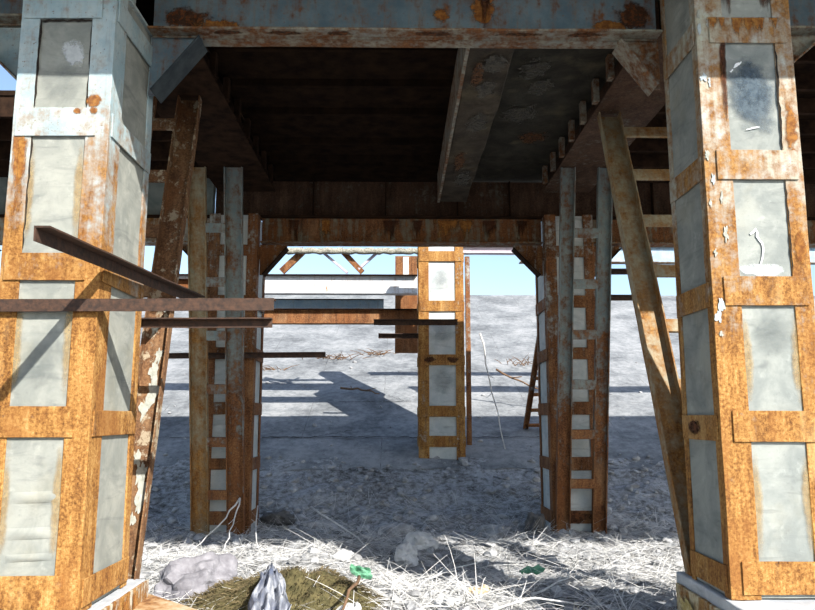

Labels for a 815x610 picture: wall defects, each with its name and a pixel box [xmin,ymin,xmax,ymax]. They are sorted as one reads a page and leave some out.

rust [166,6,241,35]
rust [416,9,450,36]
rust [470,0,495,25]
rust [568,1,648,37]
leakage [64,45,83,65]
rust [73,95,101,113]
leakage [729,63,773,124]
peeling [714,298,726,336]
peeling [138,348,163,422]
rust [688,420,700,434]
peeling [130,449,148,525]